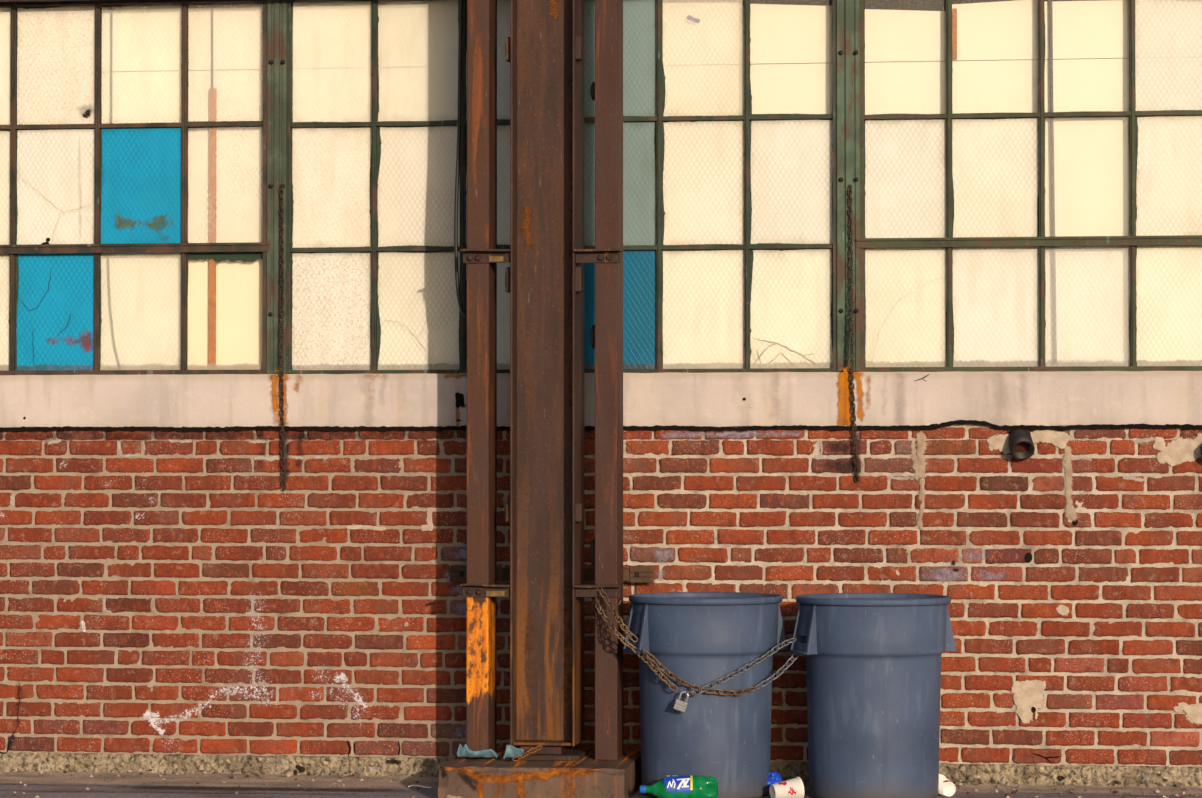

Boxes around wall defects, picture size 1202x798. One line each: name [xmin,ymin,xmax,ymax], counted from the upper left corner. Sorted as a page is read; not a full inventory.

corrosion [271,372,298,425]
corrosion [837,368,870,426]
peeling [1052,431,1092,460]
peeling [1153,437,1166,451]
corrosion [441,745,597,798]